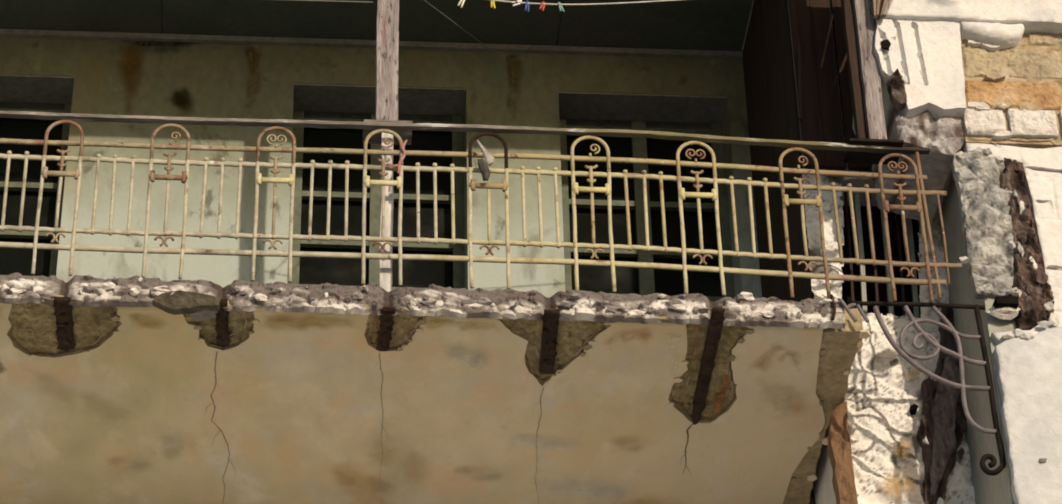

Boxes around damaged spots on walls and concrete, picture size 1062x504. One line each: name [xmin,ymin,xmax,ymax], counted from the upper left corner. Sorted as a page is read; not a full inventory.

flaking render [872,33,1062,330]
crack [204,351,235,504]
crack [376,353,387,504]
spalling [0,272,871,504]
crack [680,424,693,472]
spalling [909,308,967,504]